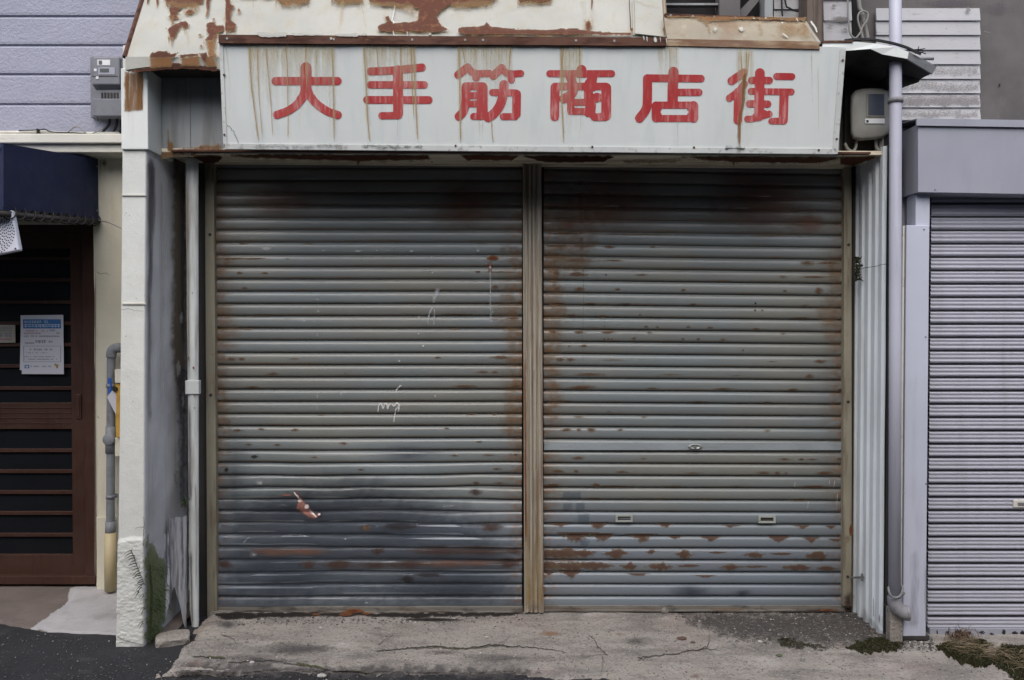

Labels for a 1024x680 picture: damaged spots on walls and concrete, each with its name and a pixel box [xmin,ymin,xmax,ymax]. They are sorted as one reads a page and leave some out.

corrosion [124,0,240,111]
corrosion [249,45,273,139]
corrosion [331,0,633,141]
corrosion [663,16,807,35]
water stain [148,158,191,500]
corrosion [364,360,853,603]
crack [193,633,563,674]
crack [638,643,714,660]